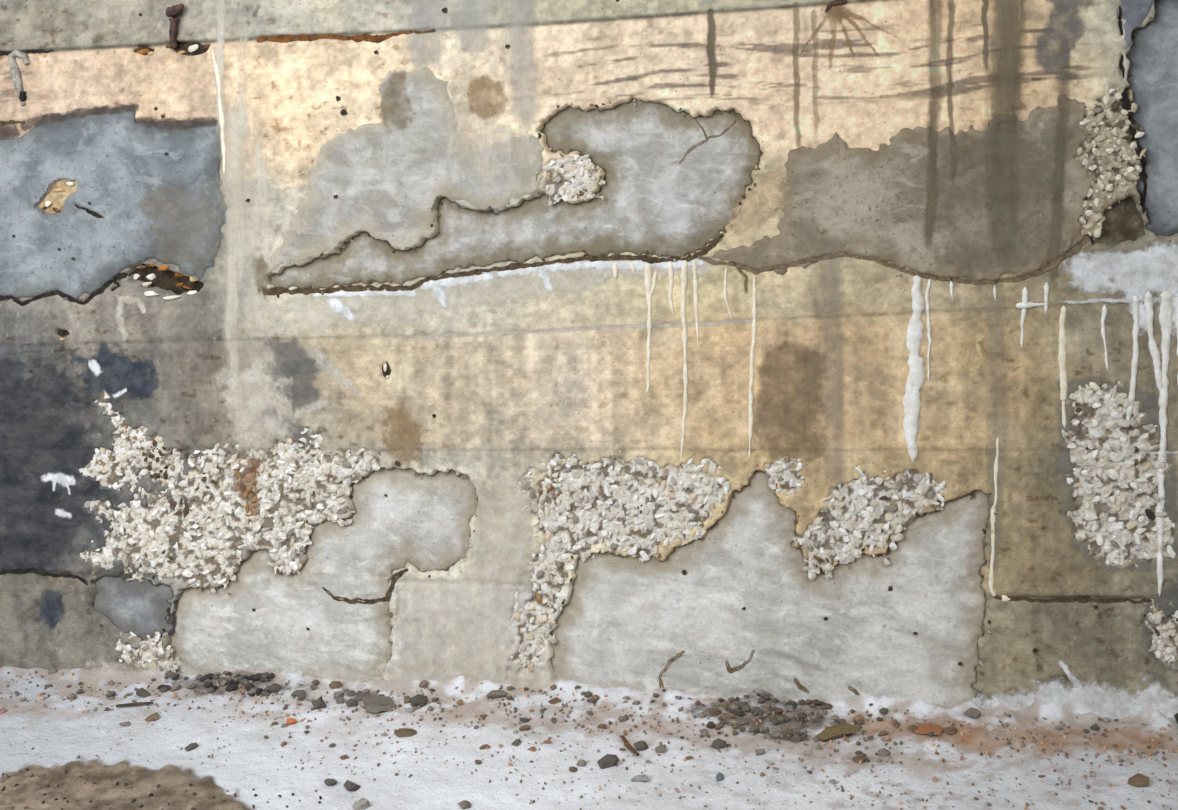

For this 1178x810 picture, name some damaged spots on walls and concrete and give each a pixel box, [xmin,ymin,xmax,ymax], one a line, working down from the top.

peeling [0,104,227,301]
leakage [0,0,822,461]
peeling [267,67,605,274]
peeling [711,84,1146,285]
leakage [0,342,158,571]
spalling [79,390,383,595]
crack [322,569,408,604]
spalling [507,444,731,679]
leakage [903,275,932,462]
leakage [1015,110,1178,671]
spalling [1061,381,1176,568]
leakage [972,661,1178,719]